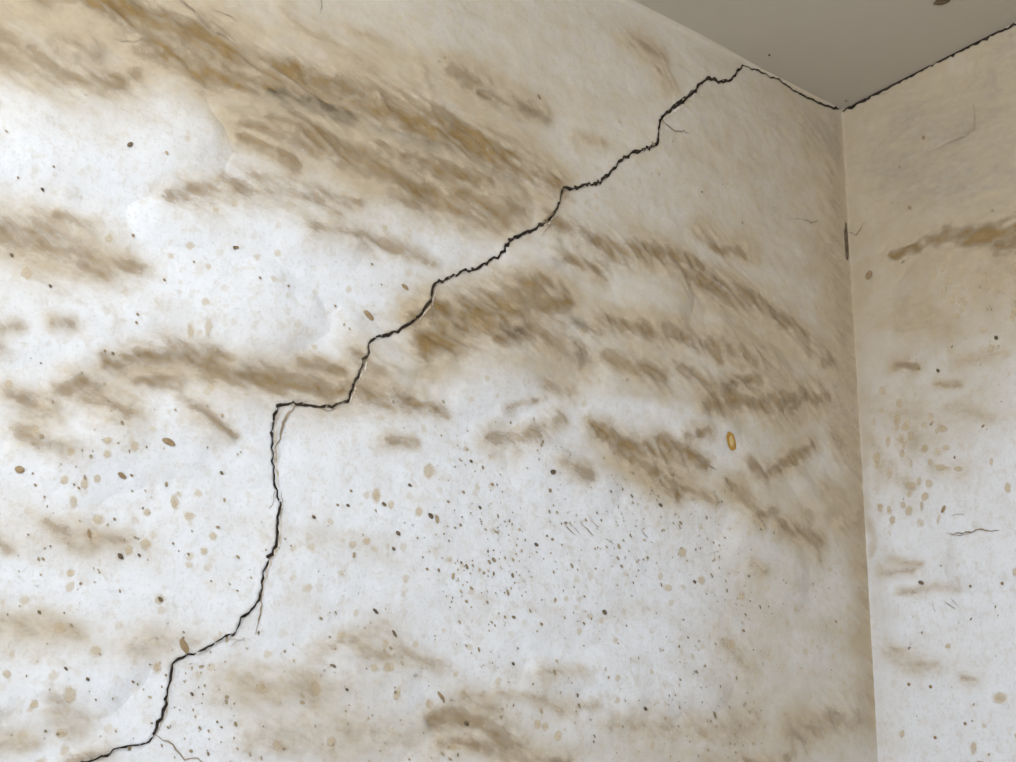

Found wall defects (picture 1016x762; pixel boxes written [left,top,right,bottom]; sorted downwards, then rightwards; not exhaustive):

crack [180,0,236,45]
leakage [134,31,260,95]
leakage [308,68,364,98]
leakage [236,133,302,173]
leakage [377,140,494,189]
leakage [341,230,437,266]
leakage [564,255,606,279]
leakage [133,374,180,389]
leakage [601,348,667,383]
leakage [189,404,237,439]
crack [81,65,840,762]
leakage [628,455,715,503]